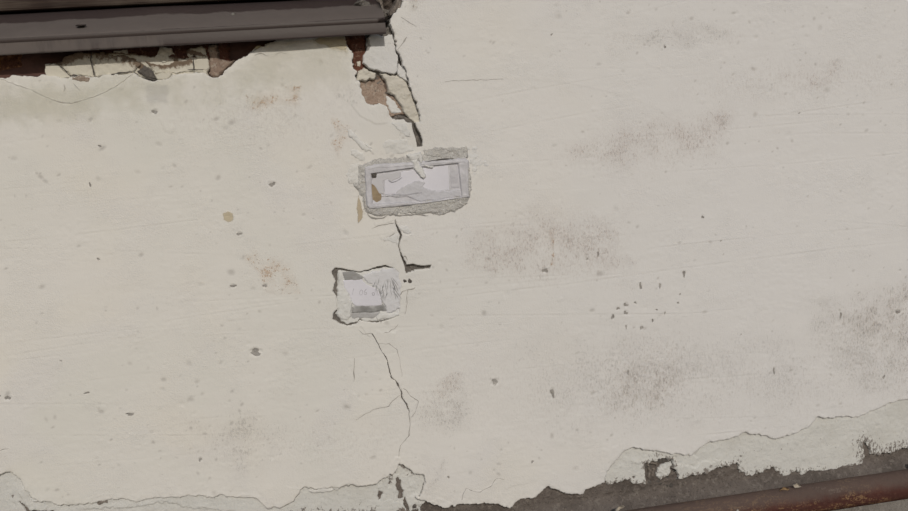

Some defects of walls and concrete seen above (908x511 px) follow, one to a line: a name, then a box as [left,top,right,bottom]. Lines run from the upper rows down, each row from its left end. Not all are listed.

spalling [0,40,276,82]
spalling [345,0,419,154]
crack [397,115,422,146]
crack [358,201,430,451]
peeling [605,399,908,485]
peeling [0,464,425,511]